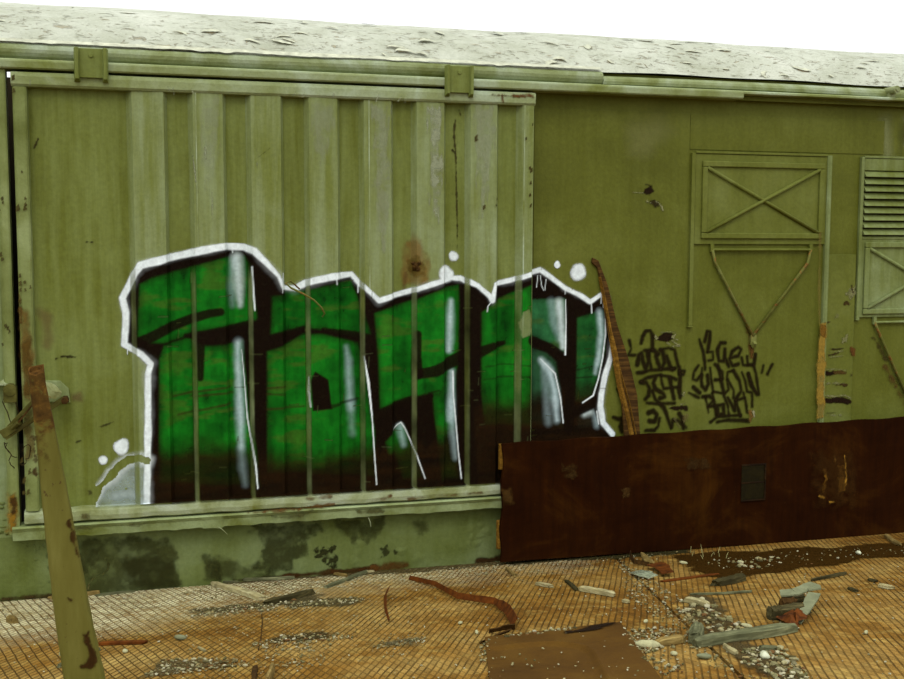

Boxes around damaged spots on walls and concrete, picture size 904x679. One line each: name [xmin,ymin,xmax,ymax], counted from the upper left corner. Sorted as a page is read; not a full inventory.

rust [18,295,34,400]
rust [816,322,827,418]
water stain [80,537,181,593]
water stain [205,524,338,579]
water stain [337,516,384,541]